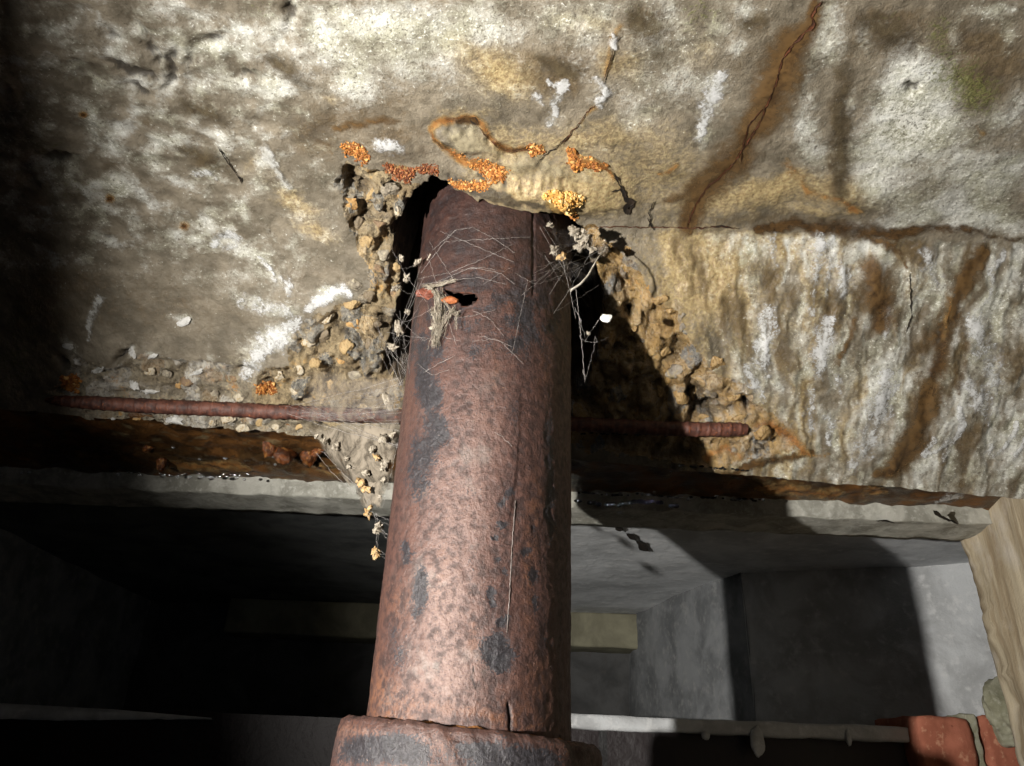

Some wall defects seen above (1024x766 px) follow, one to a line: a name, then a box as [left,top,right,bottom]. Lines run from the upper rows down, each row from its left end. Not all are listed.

corrosion [333,116,397,167]
corrosion [382,114,547,193]
leakage [533,57,578,126]
crack [538,26,621,163]
corrosion [566,146,615,181]
crack [593,1,822,229]
corrosion [541,189,586,221]
corrosion [415,288,459,304]
spalling [570,219,795,471]
leakage [744,307,778,399]
leakage [809,310,835,375]
leakage [920,313,1001,462]